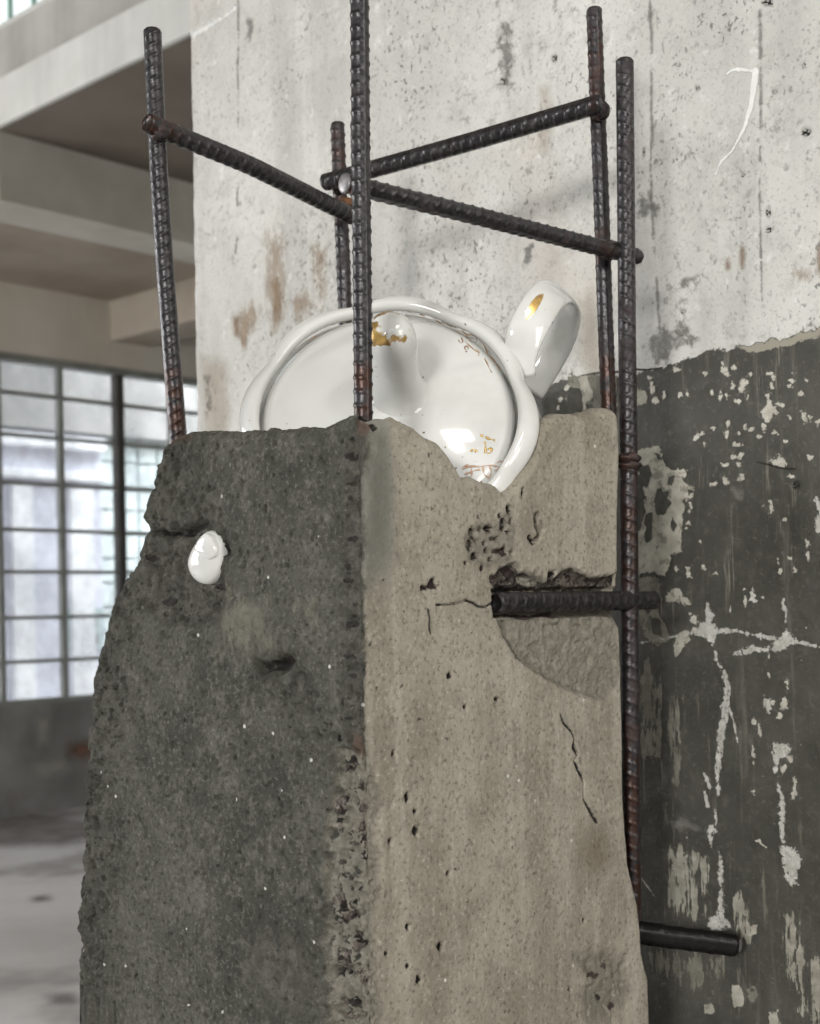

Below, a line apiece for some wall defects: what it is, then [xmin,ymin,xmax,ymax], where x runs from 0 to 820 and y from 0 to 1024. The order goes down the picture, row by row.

peeling [702,362,752,406]
spalling [489,5,718,922]
peeling [693,372,820,488]
crack [427,600,490,634]
peeling [751,680,789,765]
crack [560,715,597,823]
peeling [771,742,798,843]
peeling [733,890,757,944]
peeling [649,946,759,1008]
peeling [769,1009,781,1024]
peeling [782,911,820,1024]